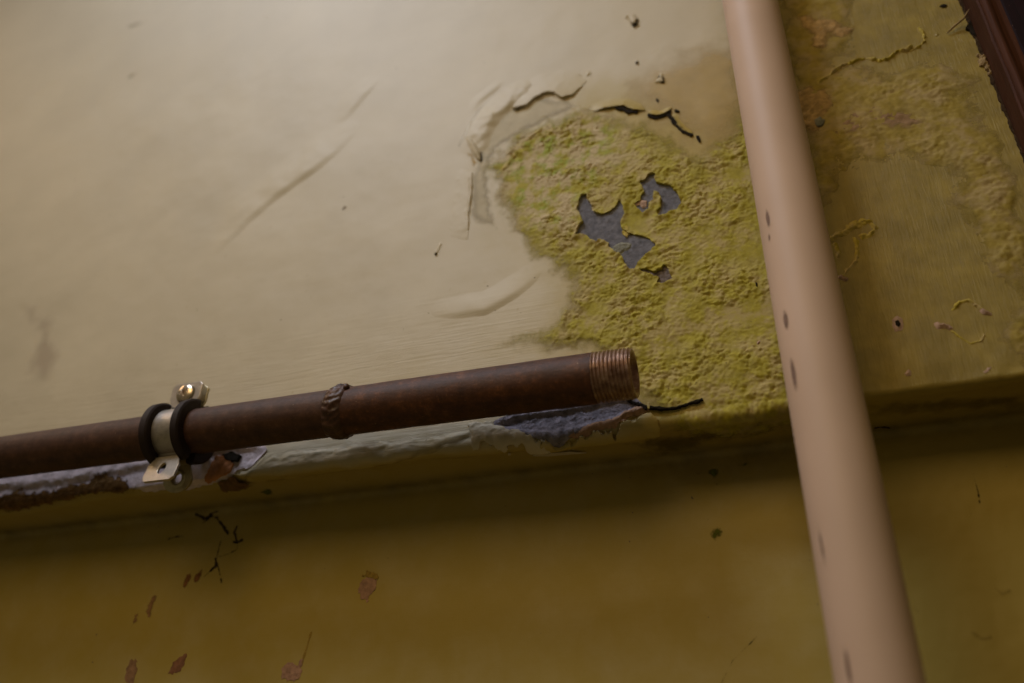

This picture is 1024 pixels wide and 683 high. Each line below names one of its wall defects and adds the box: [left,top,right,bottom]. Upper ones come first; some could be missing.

peeling [434,70,592,256]
damp [784,0,1024,290]
peeling [577,174,681,283]
damp [491,54,792,438]
flaking render [0,446,267,512]
flaking render [467,399,660,457]
crack [626,398,703,412]
crack [168,511,243,583]